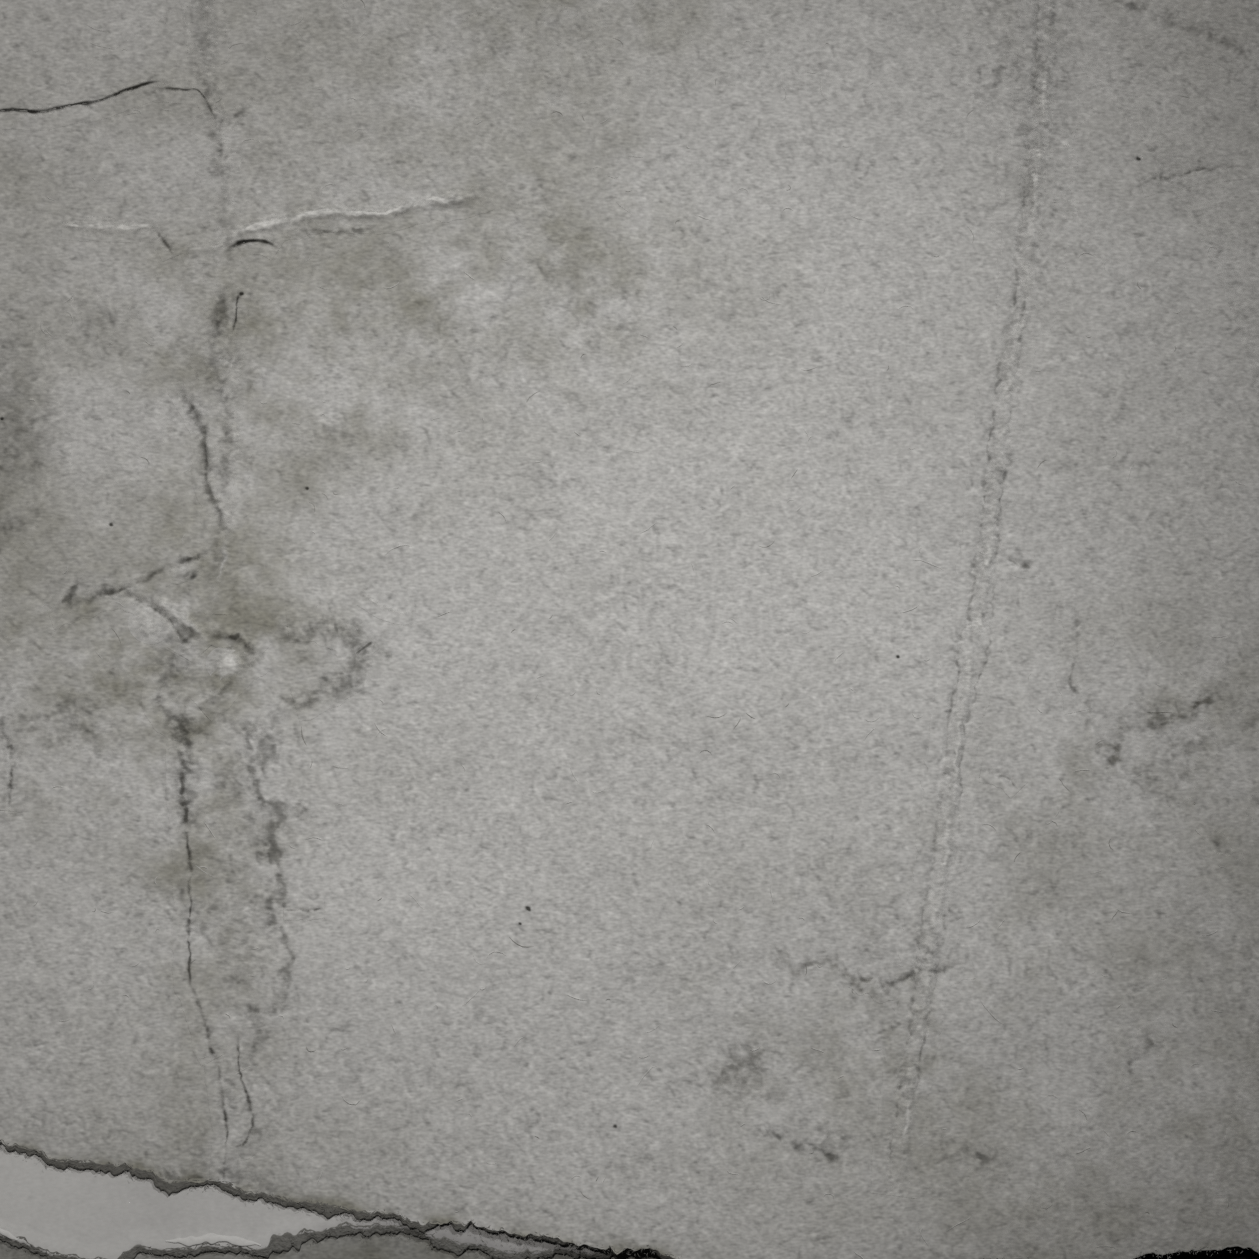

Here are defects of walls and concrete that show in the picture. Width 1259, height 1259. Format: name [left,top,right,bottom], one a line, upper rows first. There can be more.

crack [0,61,231,131]
peeling [166,1233,261,1247]